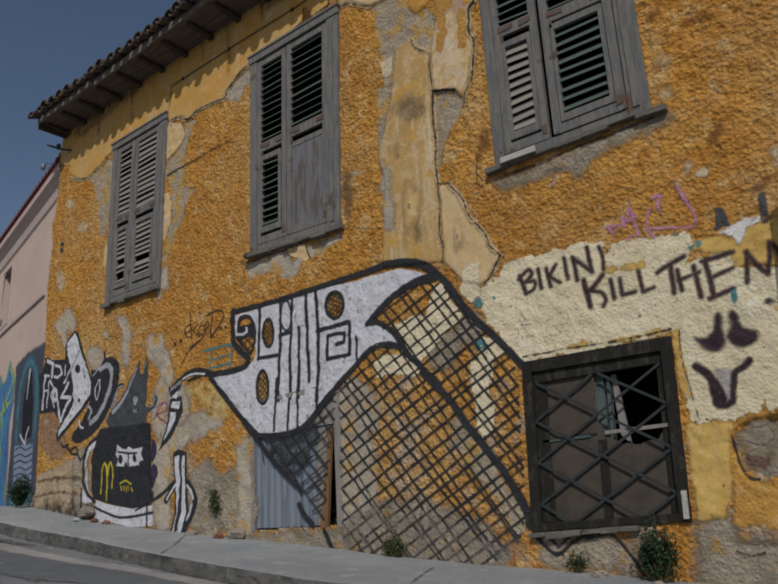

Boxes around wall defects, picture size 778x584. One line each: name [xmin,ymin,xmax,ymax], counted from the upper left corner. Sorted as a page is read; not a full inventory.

crack [71,155,108,182]
crack [167,139,232,176]
crack [168,63,249,124]
spalling [372,0,435,230]
spalling [434,91,463,167]
crack [409,0,513,287]
spalling [494,112,673,191]
spalling [90,159,112,268]
spalling [156,119,196,300]
spalling [245,234,342,279]
spalling [34,447,94,520]
spalling [735,418,778,477]